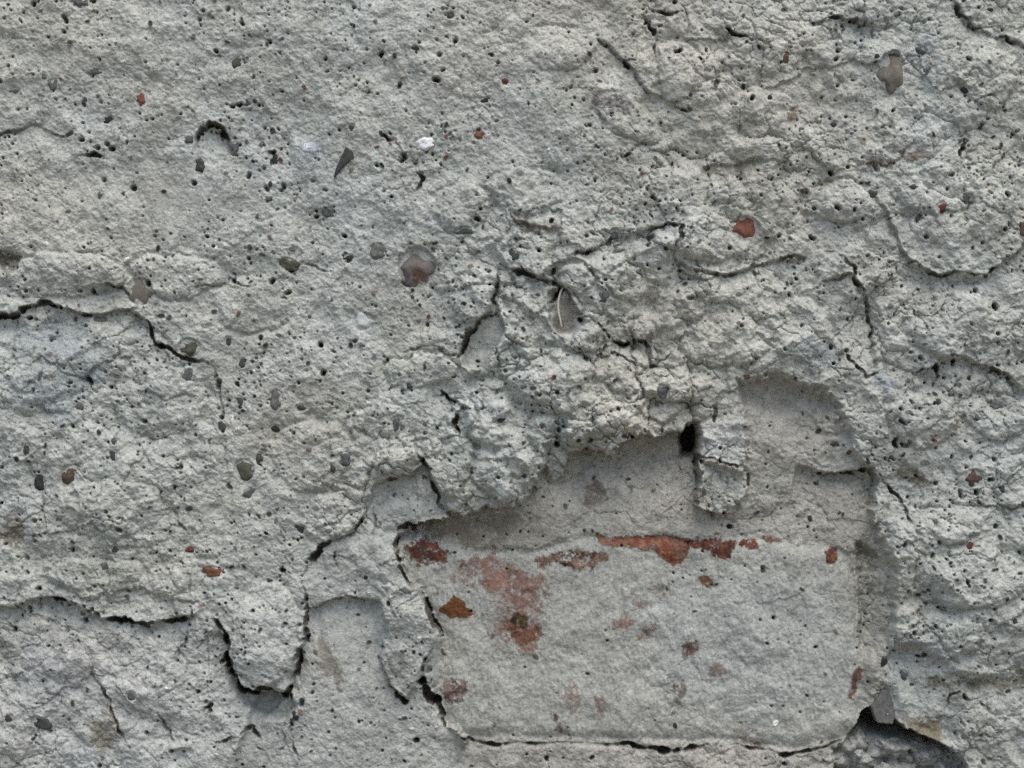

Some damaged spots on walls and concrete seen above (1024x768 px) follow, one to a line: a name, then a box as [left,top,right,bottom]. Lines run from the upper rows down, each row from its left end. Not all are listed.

crack [574,222,684,255]
crack [405,263,665,371]
crack [694,251,878,379]
crack [0,283,236,525]
crack [441,384,486,447]
crack [712,388,737,422]
crack [13,441,708,768]
spalling [231,379,964,768]
crack [8,668,21,688]
crack [734,740,840,757]